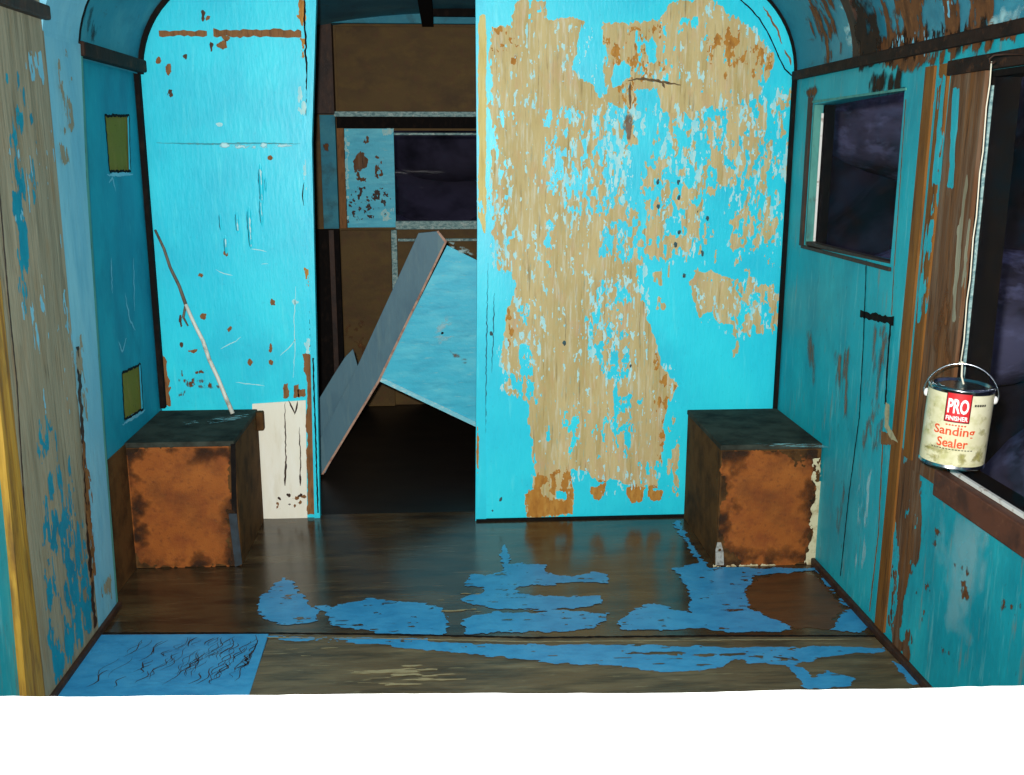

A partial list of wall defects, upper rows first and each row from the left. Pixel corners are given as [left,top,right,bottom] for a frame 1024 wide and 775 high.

peeling [6,49,88,421]
rust [159,28,301,50]
peeling [477,0,791,517]
crack [628,77,681,108]
peeling [917,75,971,323]
peeling [37,388,112,685]
peeling [888,448,922,661]